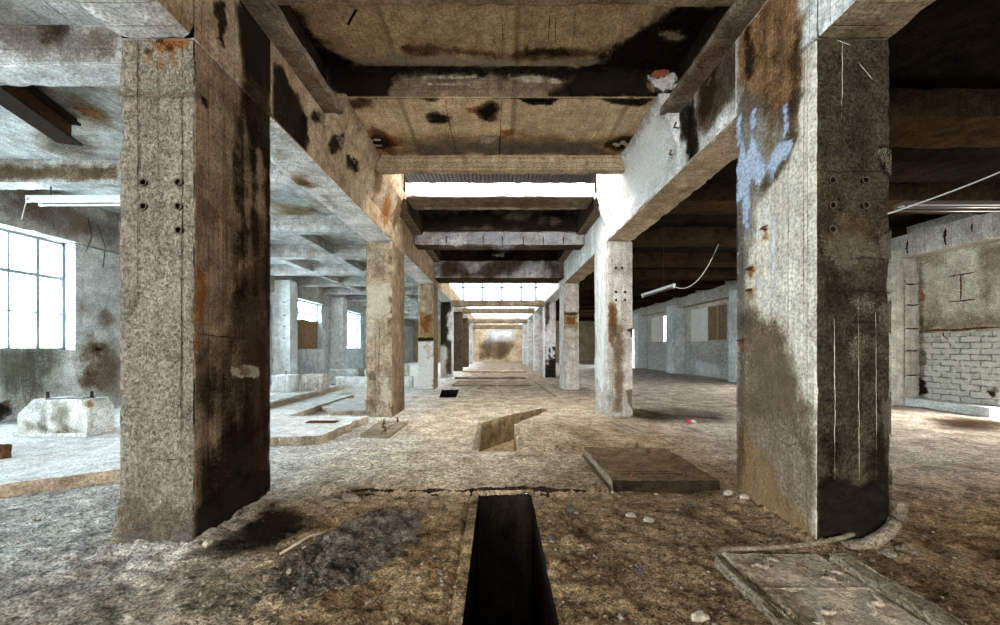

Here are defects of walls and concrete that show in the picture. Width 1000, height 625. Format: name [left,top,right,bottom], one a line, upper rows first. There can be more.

leakage [297,6,712,108]
spalling [596,69,677,106]
rust [745,28,754,77]
leakage [737,310,893,540]